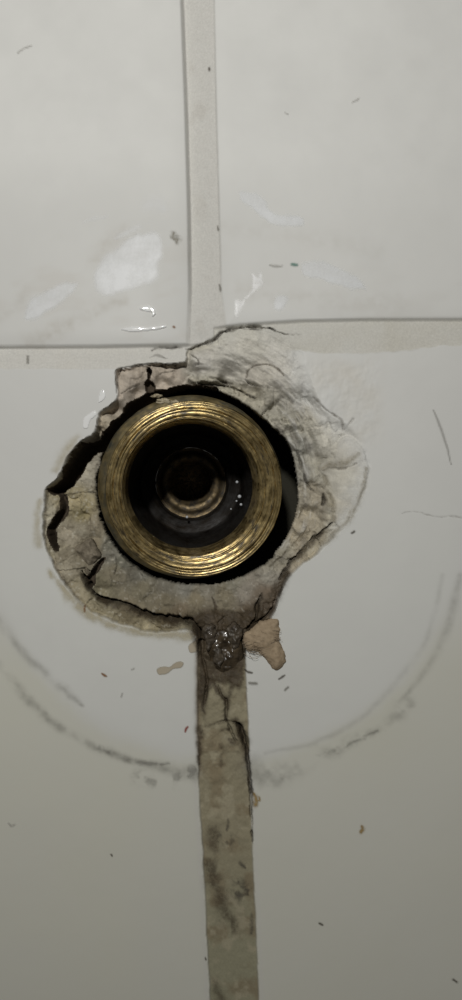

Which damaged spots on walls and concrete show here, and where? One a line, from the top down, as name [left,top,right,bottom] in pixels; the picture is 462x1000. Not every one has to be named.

crack [82,557,170,619]
crack [45,327,285,551]
spalling [41,323,371,661]